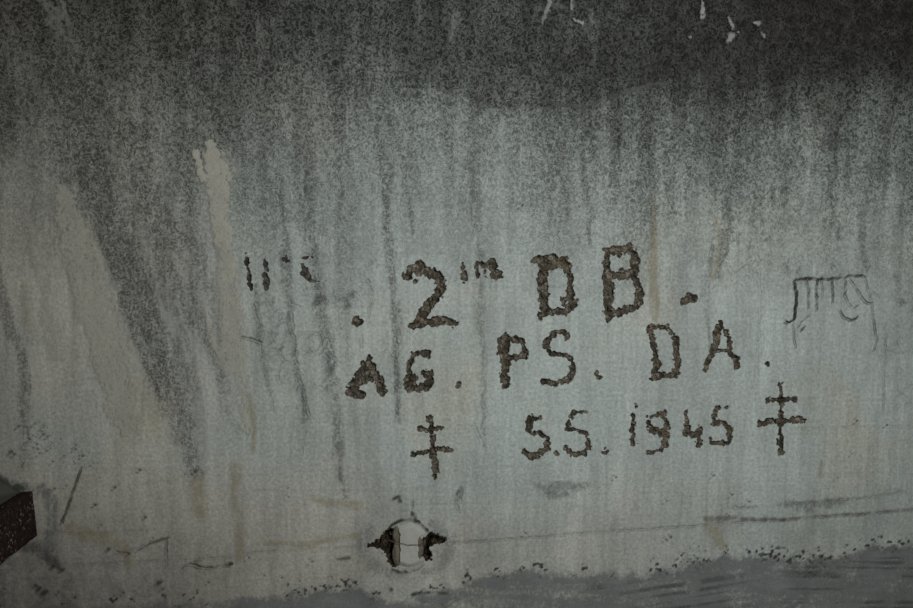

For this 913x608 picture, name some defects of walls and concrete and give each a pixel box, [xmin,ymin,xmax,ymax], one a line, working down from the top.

spalling [367,504,447,573]